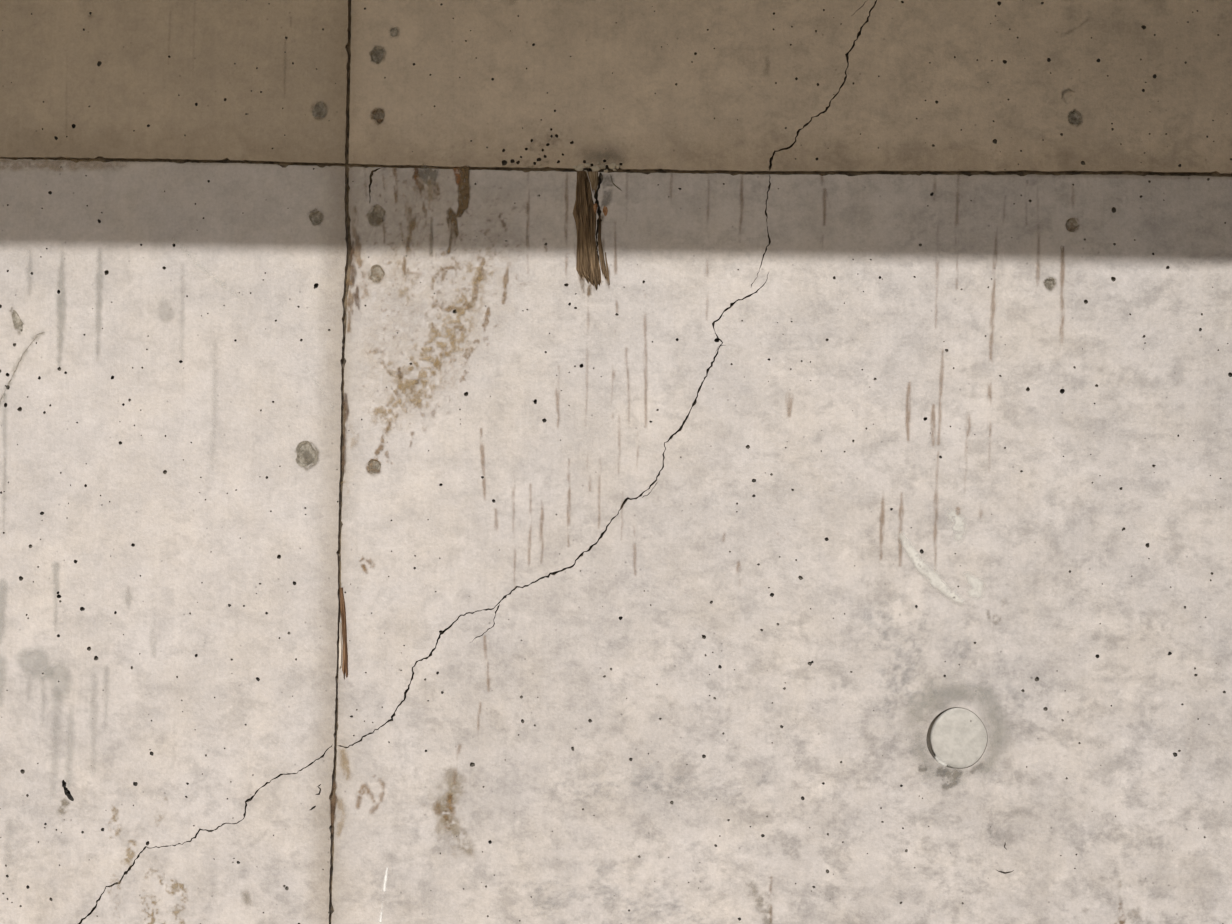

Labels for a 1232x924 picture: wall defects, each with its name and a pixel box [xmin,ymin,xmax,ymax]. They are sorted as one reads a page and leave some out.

corrosion [348,242,361,305]
corrosion [375,259,484,454]
corrosion [442,166,470,278]
crack [78,0,877,924]